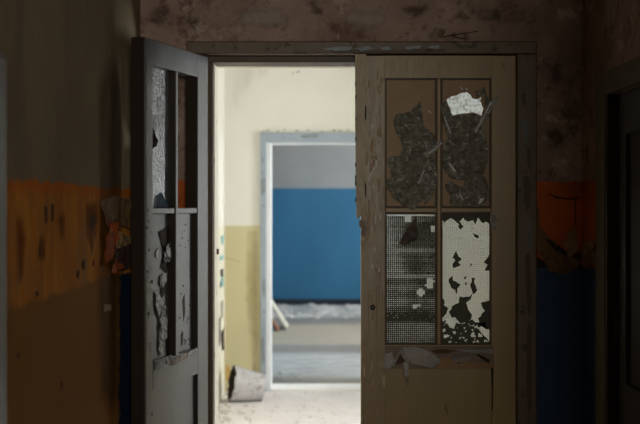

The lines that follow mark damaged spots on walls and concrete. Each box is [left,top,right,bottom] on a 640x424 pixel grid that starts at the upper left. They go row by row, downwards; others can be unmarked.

peeling [77,195,131,278]